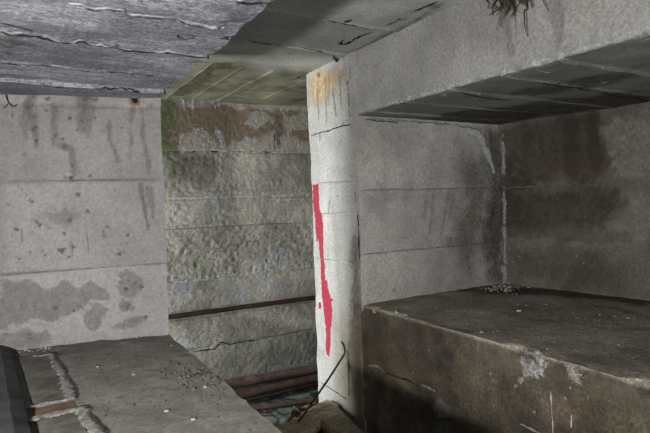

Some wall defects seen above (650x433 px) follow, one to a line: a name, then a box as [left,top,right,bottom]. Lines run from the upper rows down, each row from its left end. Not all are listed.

crack [0,23,209,64]
crack [2,61,166,110]
water stain [168,62,310,178]
water stain [431,93,650,305]
crack [193,328,313,352]
crack [368,365,435,392]
spalling [514,347,550,388]
spalling [563,364,582,389]